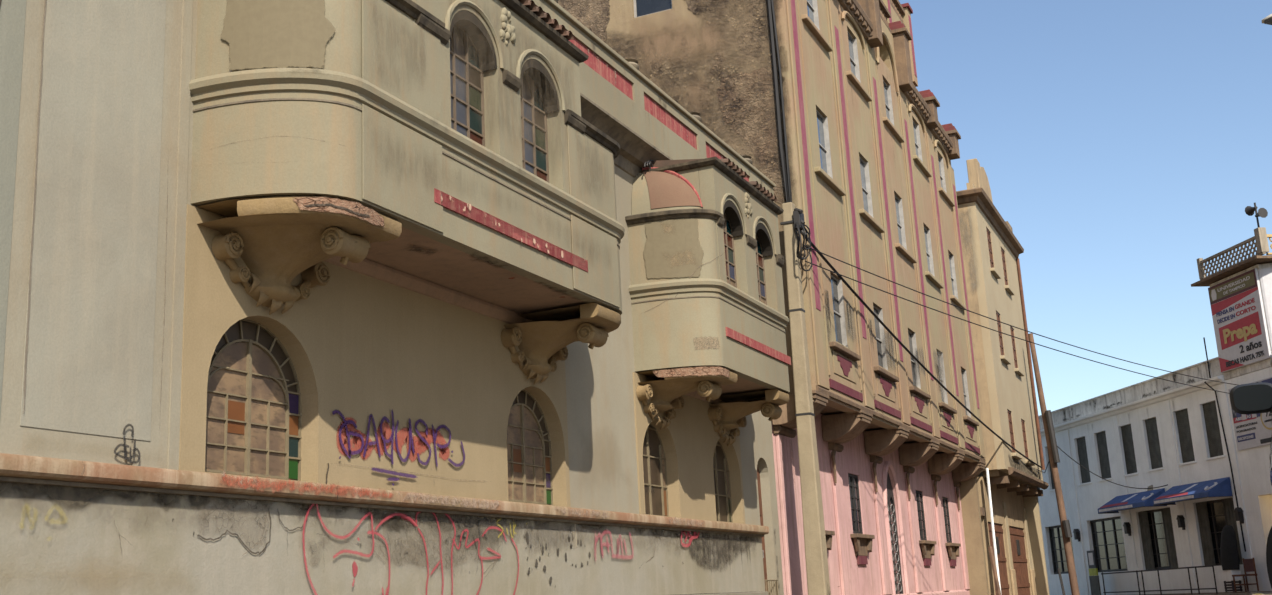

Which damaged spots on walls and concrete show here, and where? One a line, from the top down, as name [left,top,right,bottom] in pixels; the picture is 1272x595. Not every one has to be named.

peeling [558,0,792,204]
leakage [290,502,607,547]
leakage [638,528,753,568]